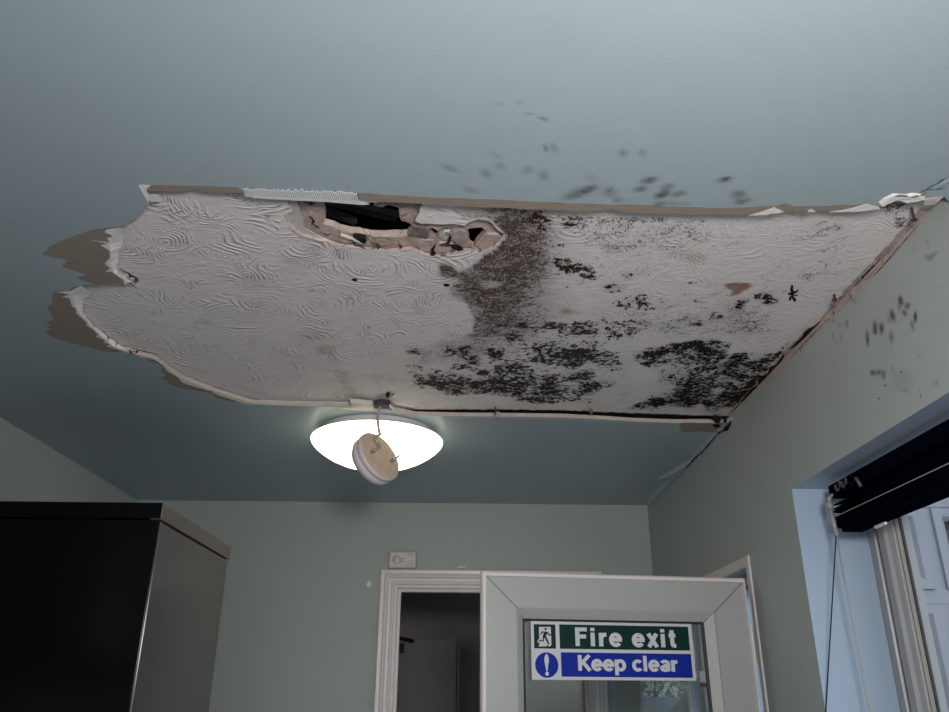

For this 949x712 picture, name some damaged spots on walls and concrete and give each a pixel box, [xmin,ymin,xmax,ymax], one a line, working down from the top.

water stain [878,202,910,227]
spalling [93,227,137,287]
spalling [59,286,129,353]
water stain [407,208,863,419]
flaking render [711,193,945,433]